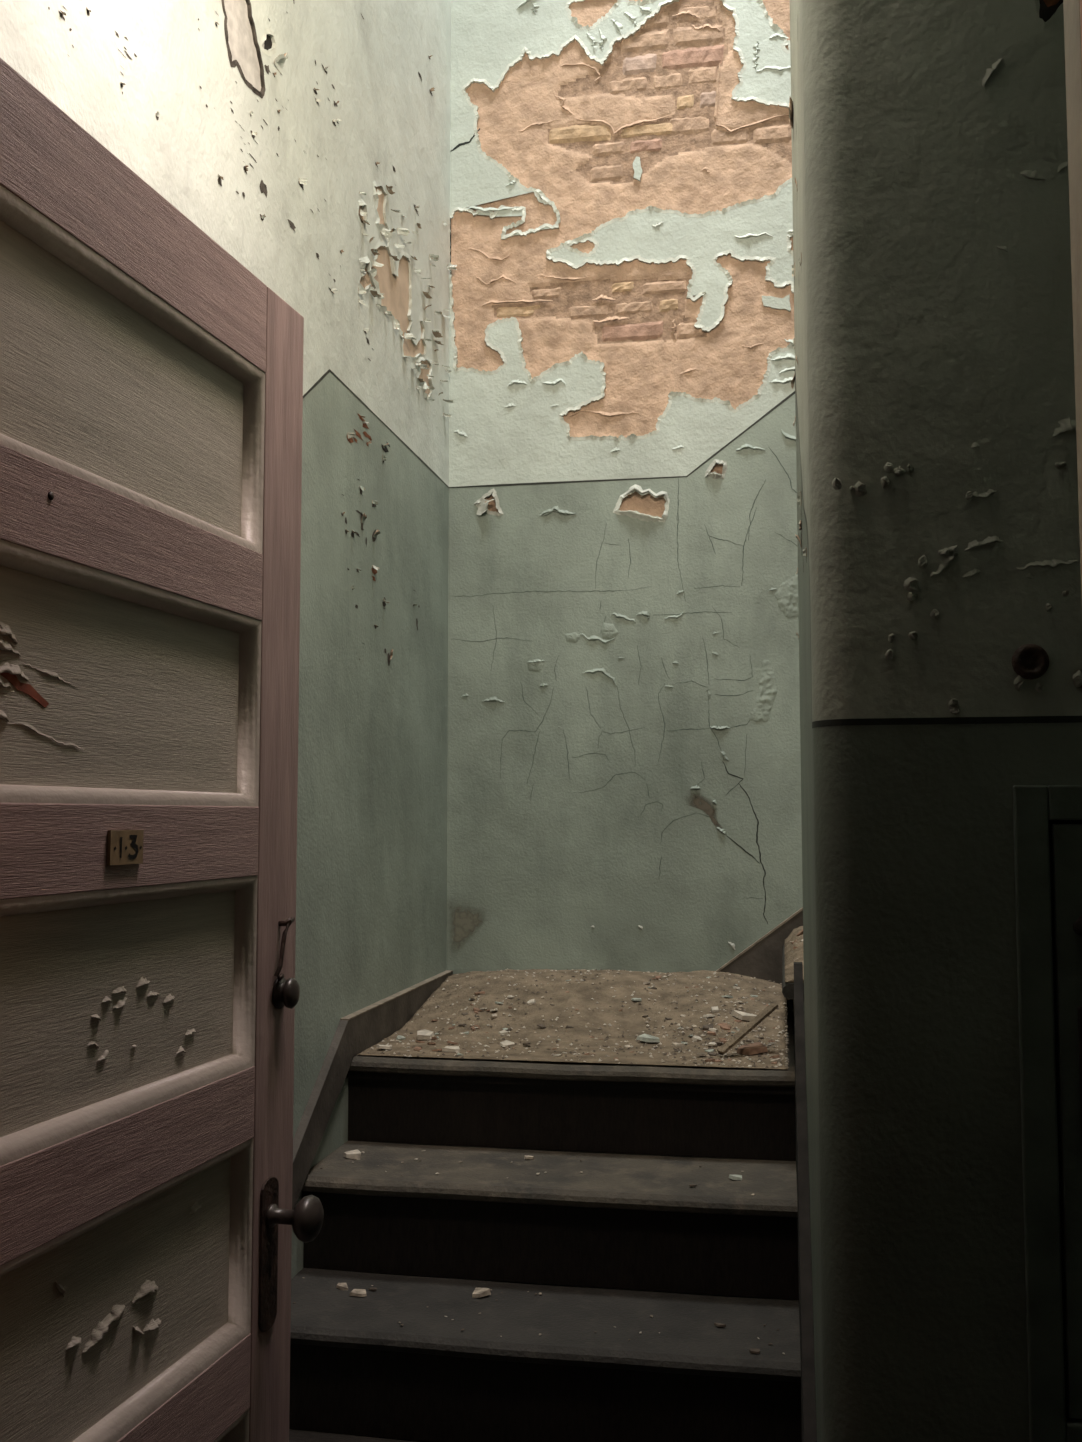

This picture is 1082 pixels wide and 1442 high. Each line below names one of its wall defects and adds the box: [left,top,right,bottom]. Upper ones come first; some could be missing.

hole [1029,0,1064,30]
peeling [313,60,342,126]
peeling [340,0,802,452]
peeling [347,414,390,463]
peeling [474,488,503,516]
peeling [538,506,577,517]
peeling [613,484,670,522]
peeling [769,491,807,638]
peeling [611,611,684,622]
crack [458,449,797,924]